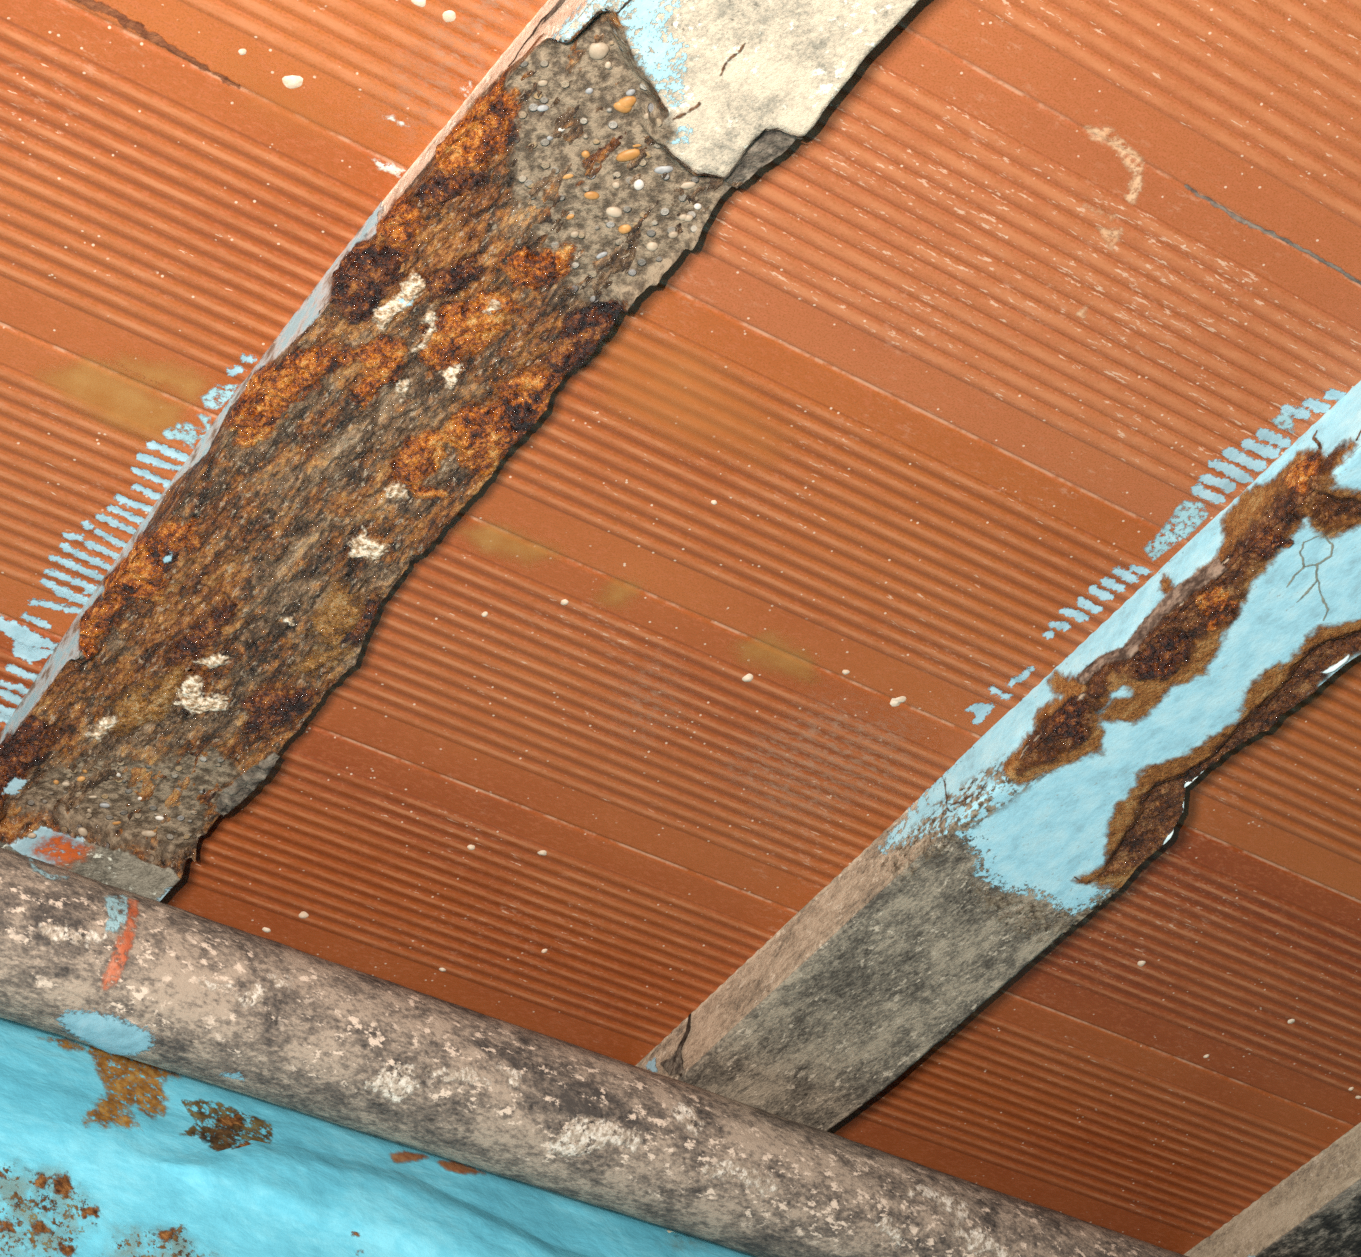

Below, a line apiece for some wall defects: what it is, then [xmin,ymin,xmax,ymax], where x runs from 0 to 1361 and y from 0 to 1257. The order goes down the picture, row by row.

spalling [0,0,802,879]
peeling [878,381,1361,943]
corrosion [50,1037,272,1151]
corrosion [0,1166,100,1257]
corrosion [117,1226,205,1257]